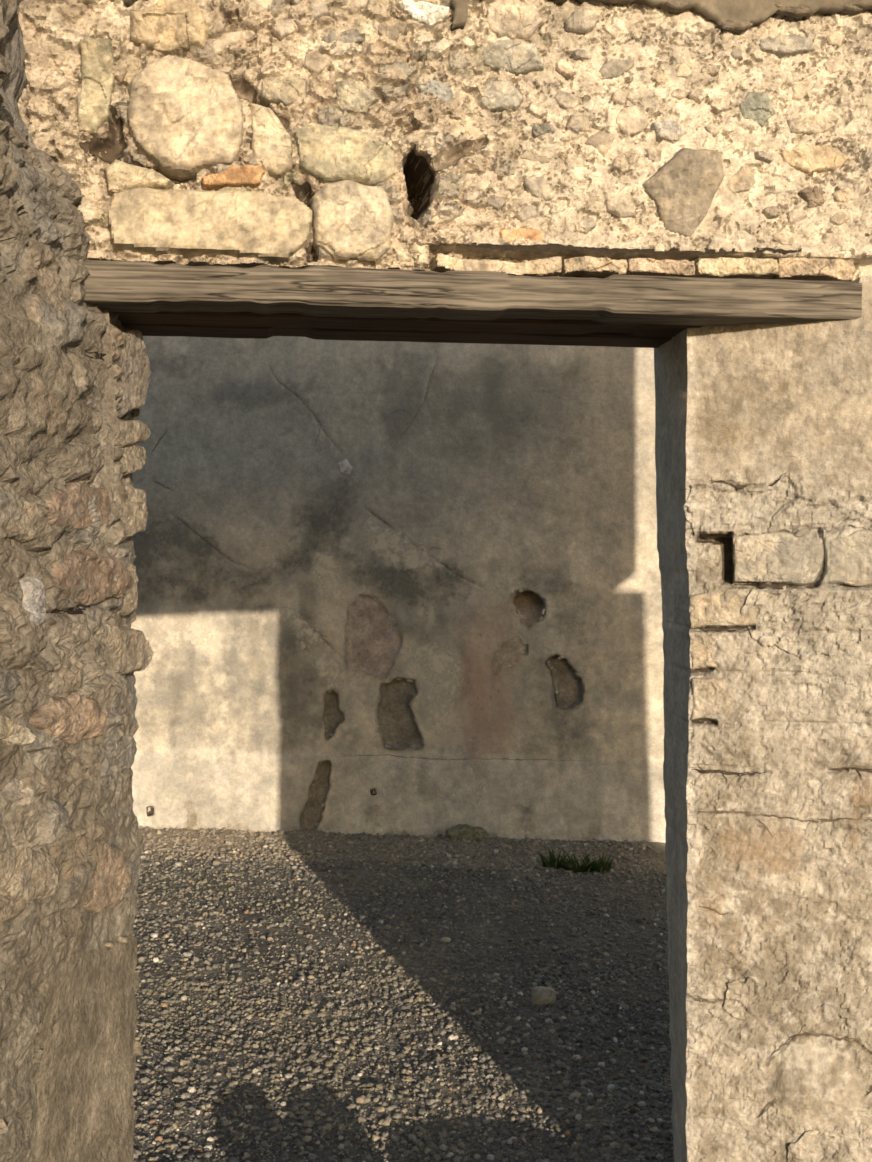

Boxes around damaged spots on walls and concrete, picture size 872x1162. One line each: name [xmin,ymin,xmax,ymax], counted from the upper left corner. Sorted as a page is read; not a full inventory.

spalling [507,586,548,656]
flaking render [343,590,426,751]
flaking render [545,653,586,711]
flaking render [321,688,347,742]
flaking render [299,756,333,831]
crack [688,995,725,1004]
crack [767,1024,869,1059]
crack [757,1098,777,1118]